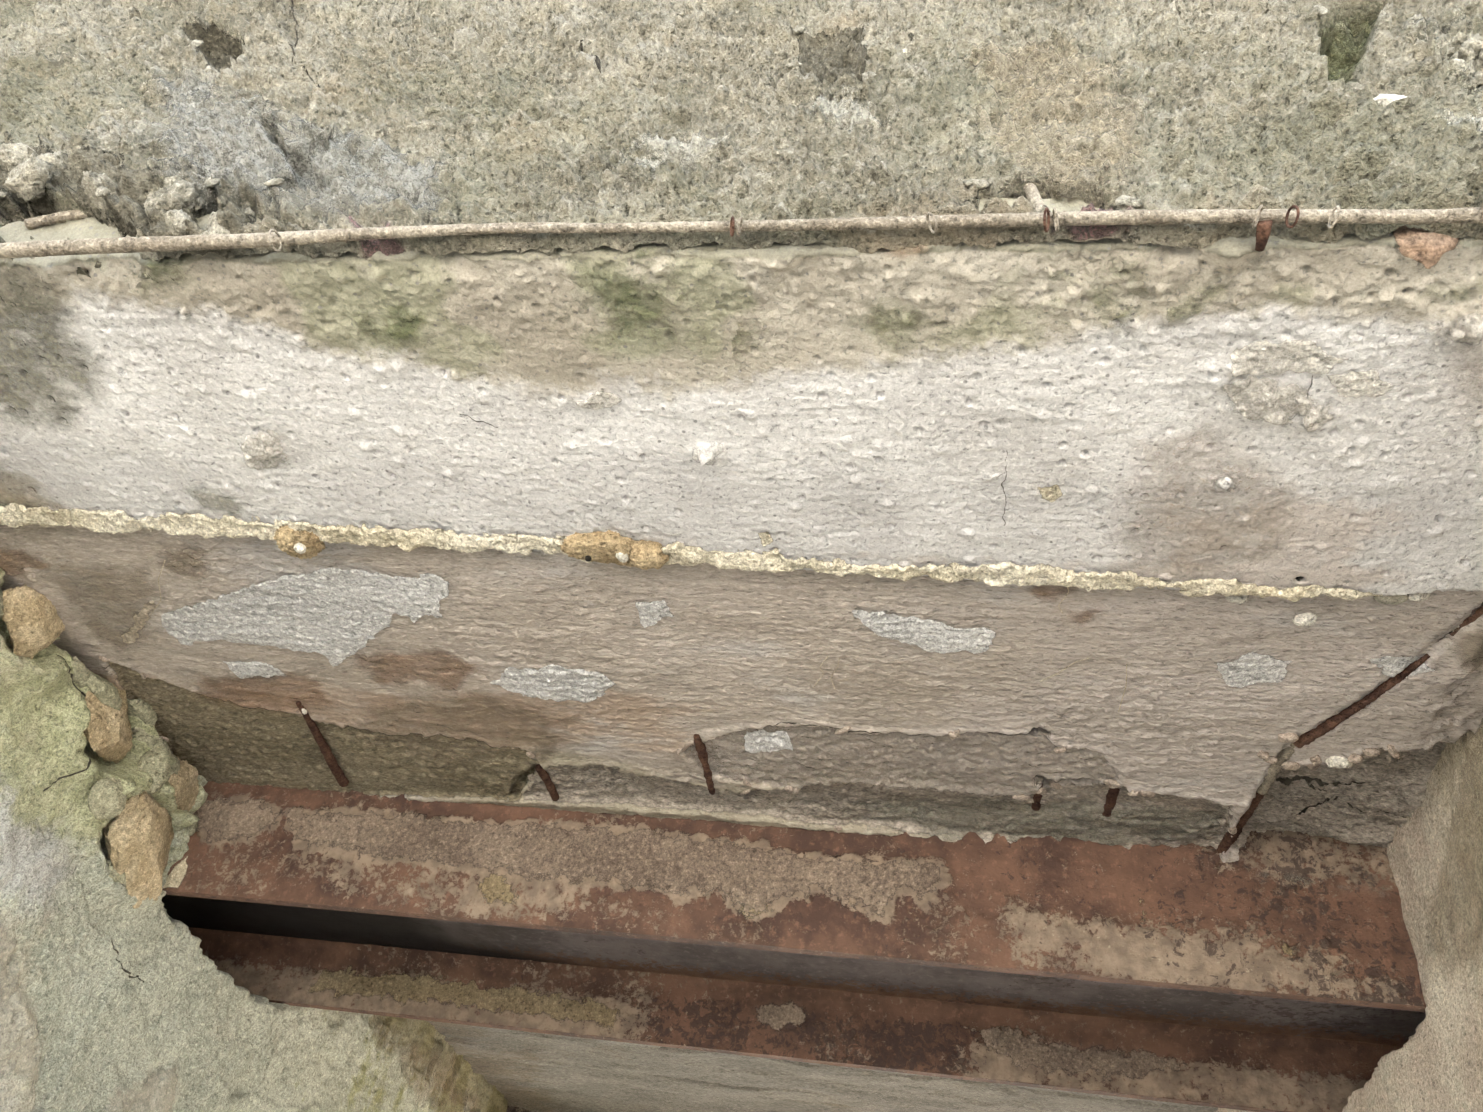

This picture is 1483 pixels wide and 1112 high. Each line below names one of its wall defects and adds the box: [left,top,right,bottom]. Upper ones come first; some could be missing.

rust [347,214,404,258]
spalling [0,176,1483,278]
rust [1044,203,1132,241]
water stain [0,278,90,421]
water stain [1038,485,1062,502]
water stain [0,502,591,563]
peeling [293,543,306,554]
water stain [661,532,1383,602]
peeling [121,567,449,679]
peeling [852,610,996,654]
spalling [1449,606,1483,636]
spalling [99,652,1446,856]